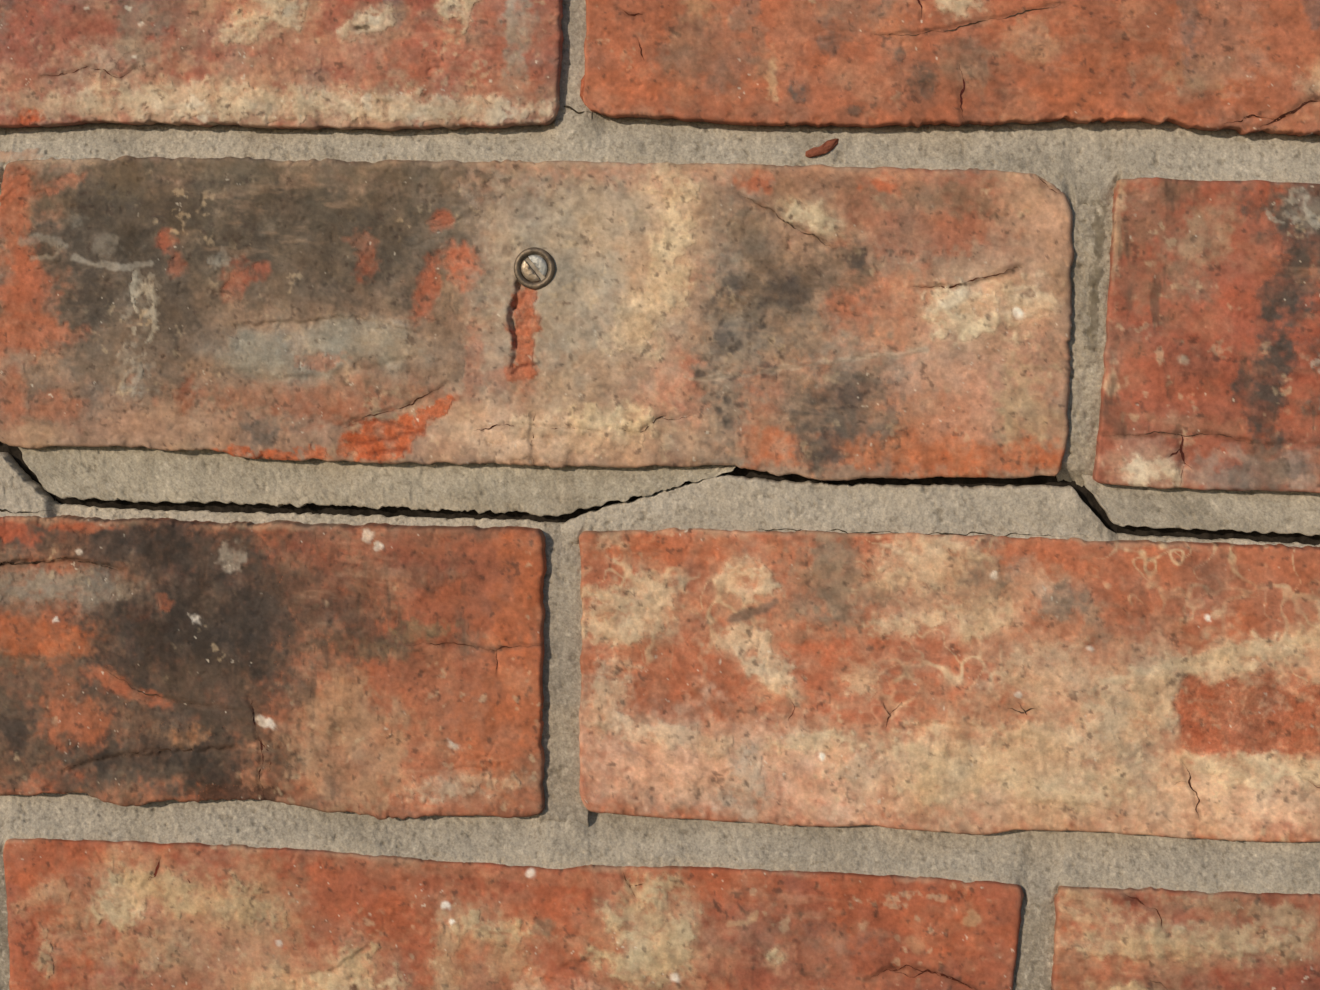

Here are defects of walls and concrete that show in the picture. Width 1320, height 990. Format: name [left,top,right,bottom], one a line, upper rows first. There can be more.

crack [0,442,1320,546]